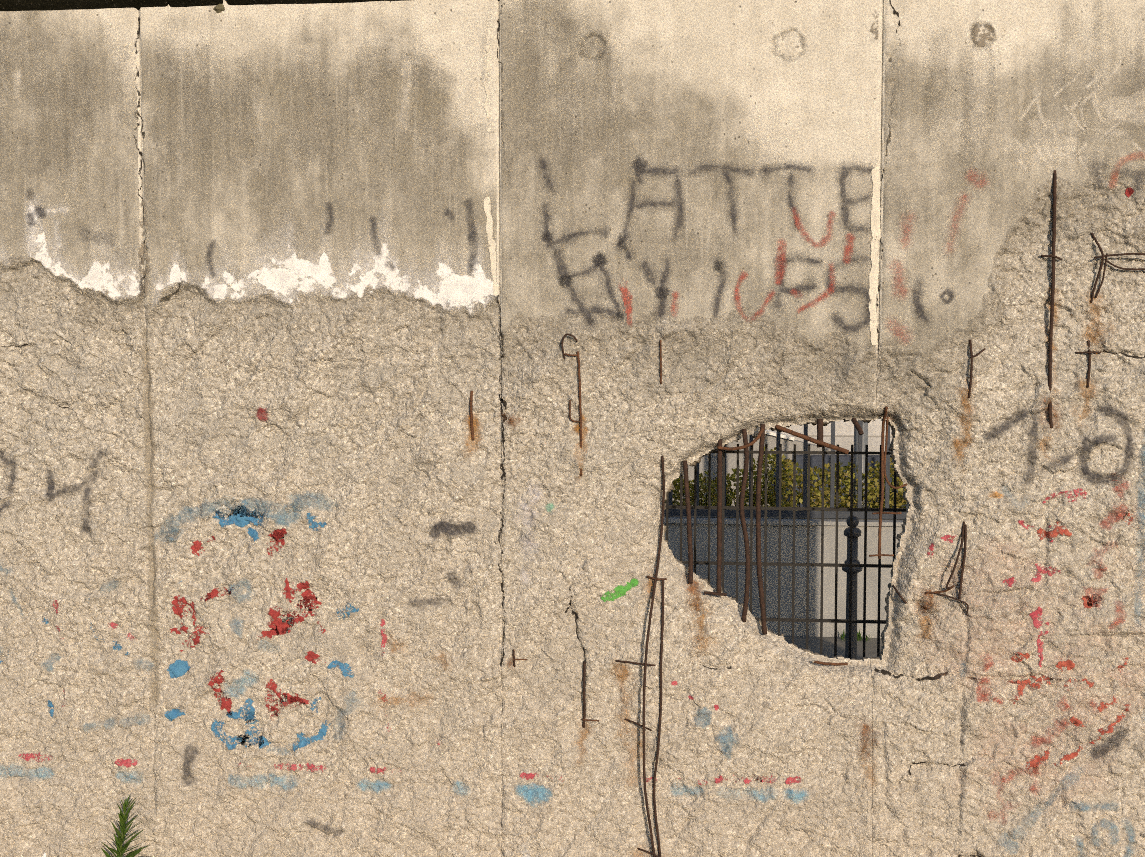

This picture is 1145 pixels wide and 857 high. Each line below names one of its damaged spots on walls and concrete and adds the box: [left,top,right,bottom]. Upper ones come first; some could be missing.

spalling [0,206,503,857]
leakage [0,10,508,297]
rust [561,333,584,448]
rust [582,662,599,728]
leakage [501,6,754,317]
rust [616,456,667,857]
rust [683,419,849,635]
spalling [500,167,1145,857]
leakage [831,226,869,325]
rust [924,521,969,633]
rust [1041,170,1062,428]
rust [1090,232,1145,303]